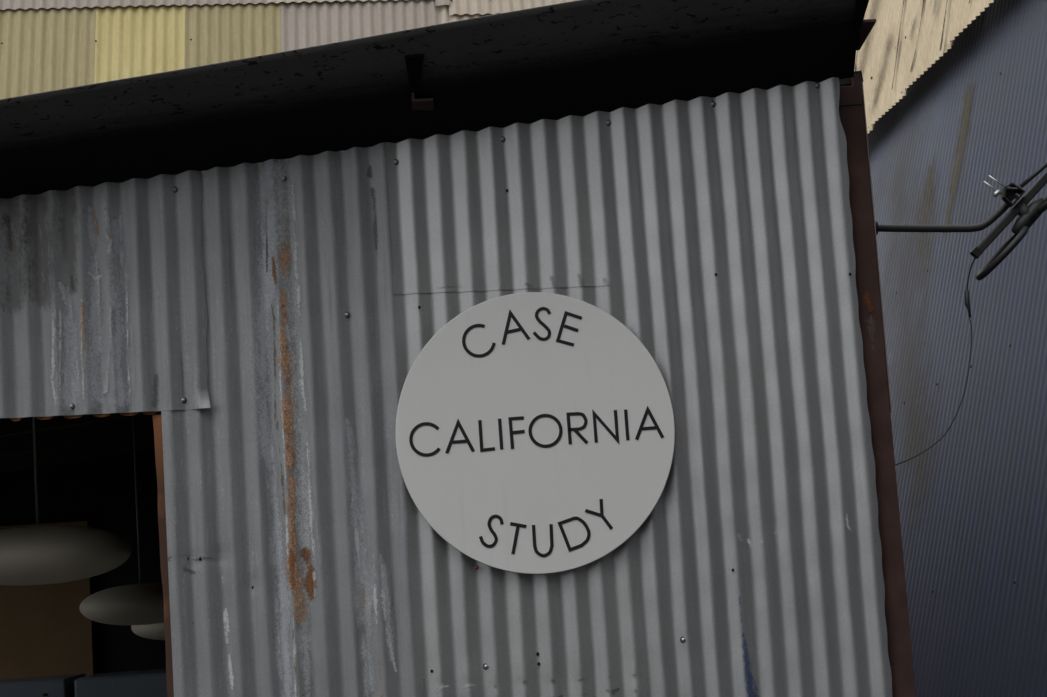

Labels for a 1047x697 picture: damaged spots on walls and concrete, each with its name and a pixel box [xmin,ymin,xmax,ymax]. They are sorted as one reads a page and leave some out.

corrosion [272,244,316,623]